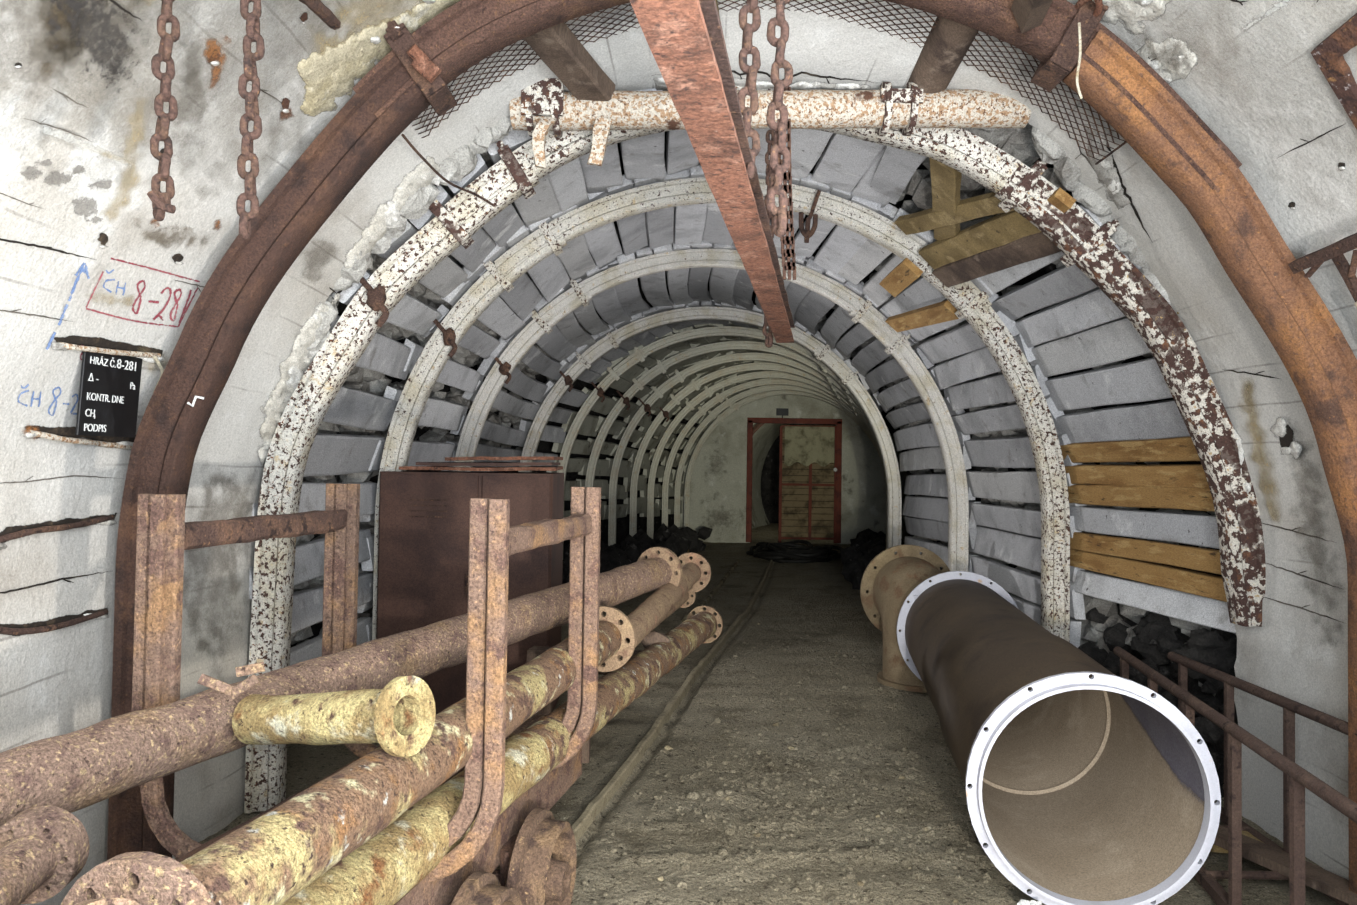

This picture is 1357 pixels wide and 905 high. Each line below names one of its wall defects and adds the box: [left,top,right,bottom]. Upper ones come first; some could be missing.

crack [101,0,142,21]
leakage [48,0,139,93]
crack [0,238,96,260]
corrosion [399,456,563,471]